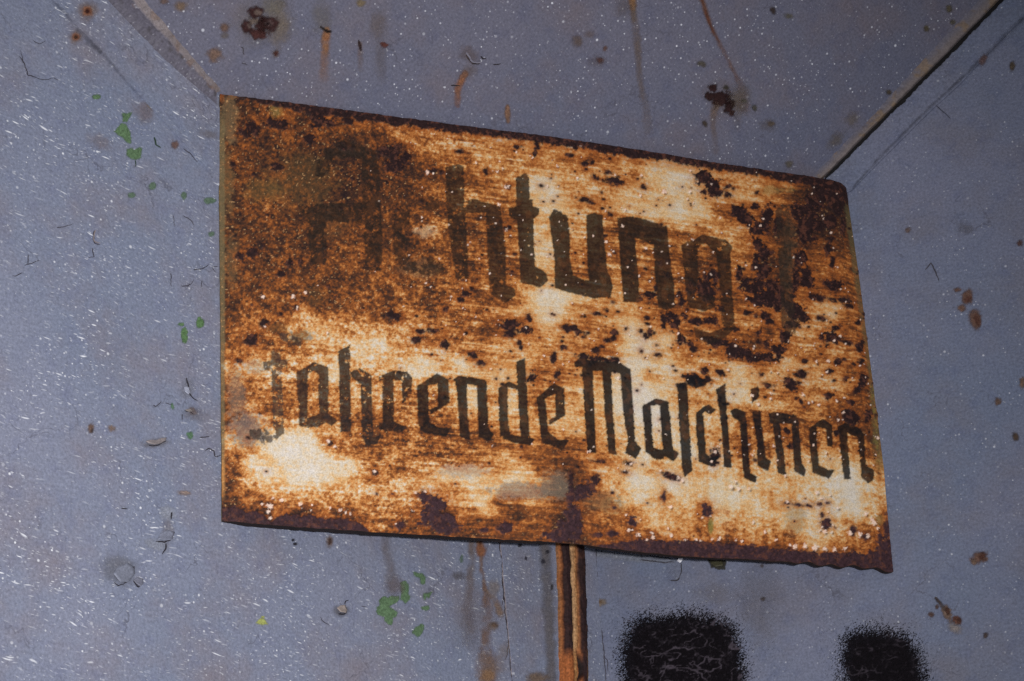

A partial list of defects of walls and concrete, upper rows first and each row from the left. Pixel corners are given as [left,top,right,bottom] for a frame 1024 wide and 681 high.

rust [221,6,284,40]
rust [954,288,981,329]
rust [971,552,988,565]
rust [470,541,502,643]
crack [499,543,513,681]